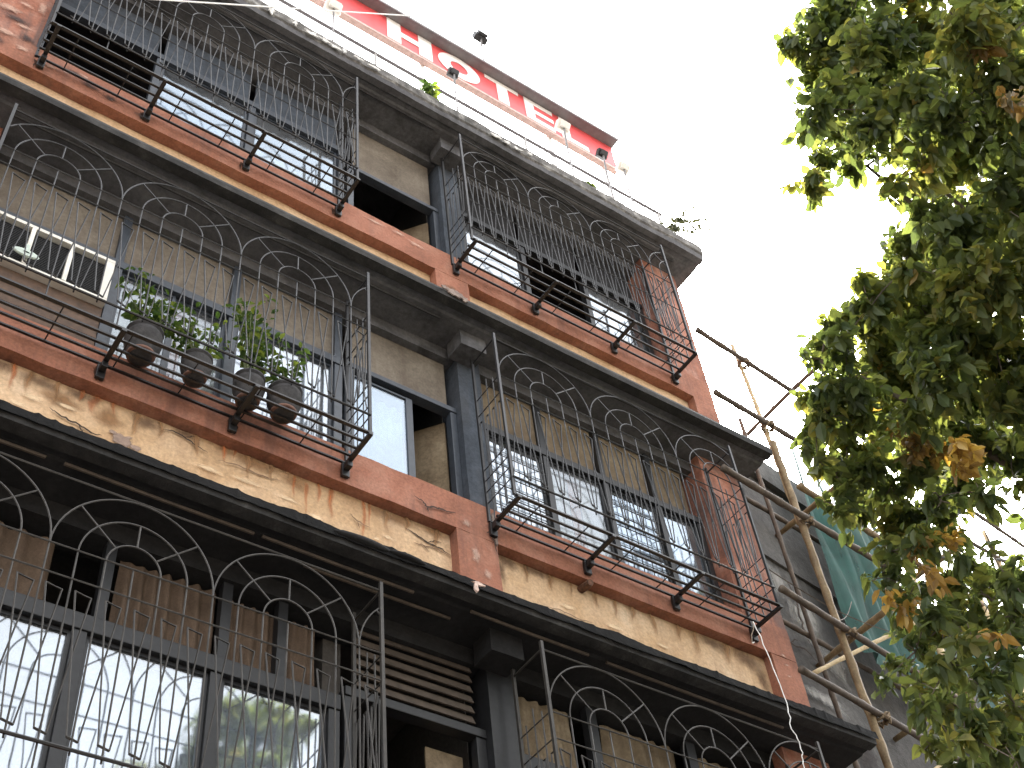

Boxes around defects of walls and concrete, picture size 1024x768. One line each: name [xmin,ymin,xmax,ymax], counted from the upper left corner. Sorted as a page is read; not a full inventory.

crack [50,408,102,436]
spalling [109,430,141,451]
crack [165,429,280,481]
crack [415,496,456,513]
crack [407,529,450,556]